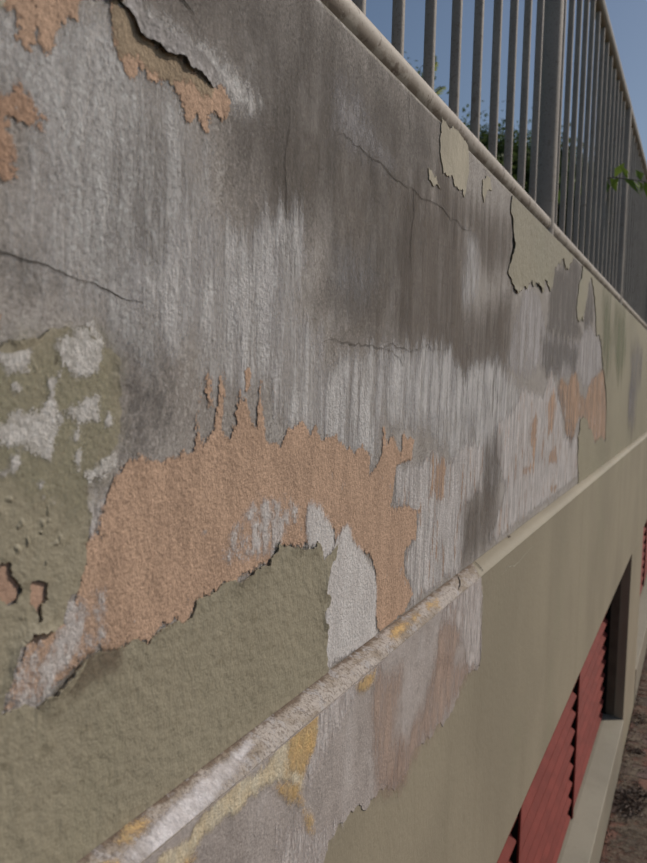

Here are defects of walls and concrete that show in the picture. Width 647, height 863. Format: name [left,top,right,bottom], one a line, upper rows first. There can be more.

crack [0,251,143,303]
peeling [0,347,33,396]
peeling [0,370,115,477]
peeling [0,562,19,604]
peeling [30,581,47,614]
peeling [1,624,66,714]
peeling [431,606,459,729]
peeling [374,672,401,786]
peeling [158,737,304,863]